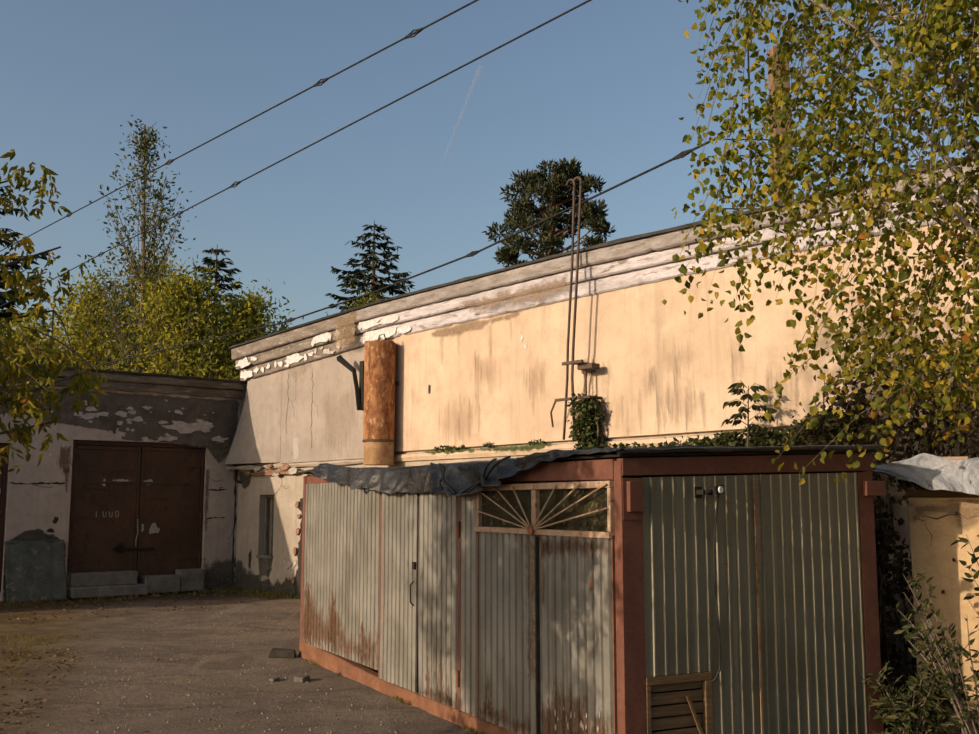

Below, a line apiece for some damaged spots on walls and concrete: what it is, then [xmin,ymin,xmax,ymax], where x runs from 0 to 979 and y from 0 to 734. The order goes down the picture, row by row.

peeling [235,315,412,380]
peeling [74,399,229,443]
spalling [284,498,303,597]
crack [911,514,979,547]
rust [303,580,376,667]
rust [481,685,612,734]